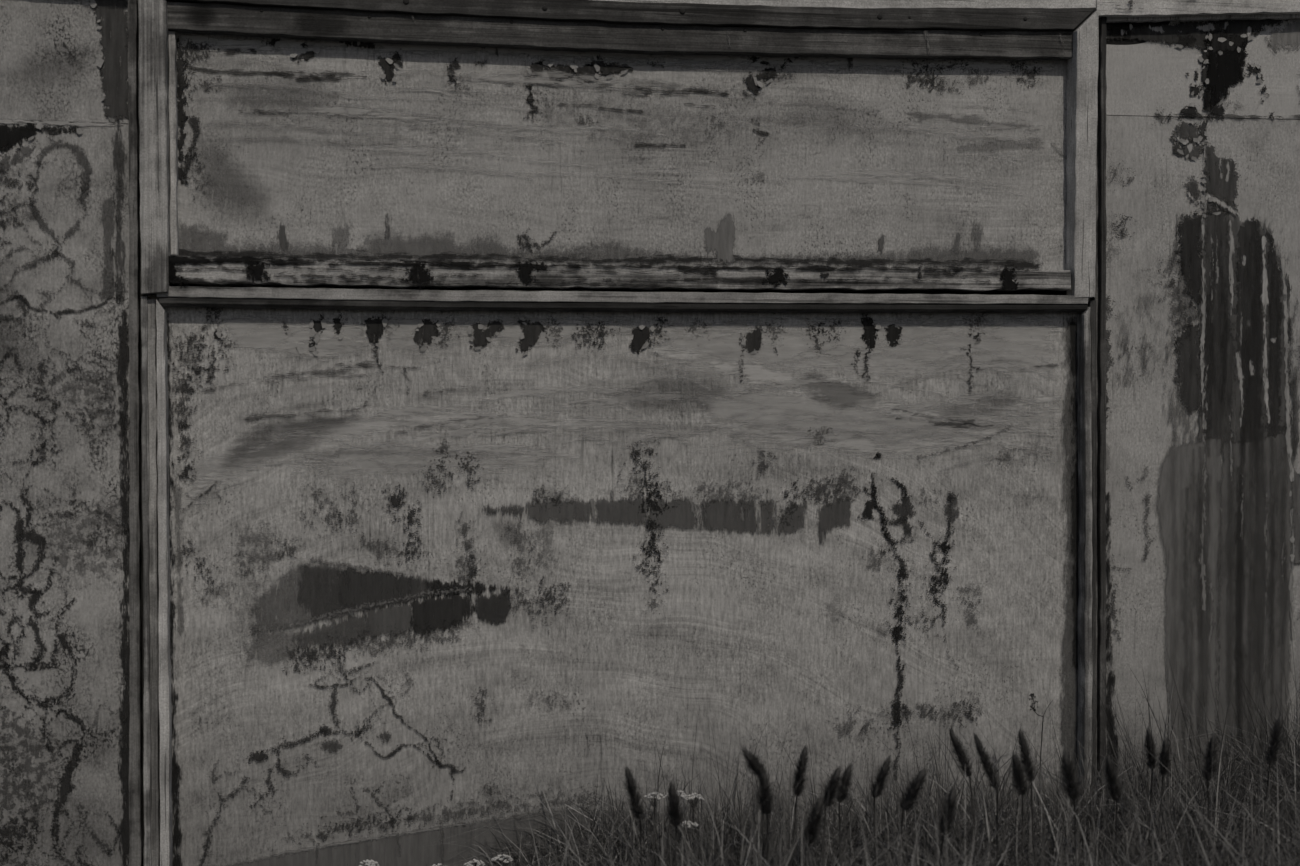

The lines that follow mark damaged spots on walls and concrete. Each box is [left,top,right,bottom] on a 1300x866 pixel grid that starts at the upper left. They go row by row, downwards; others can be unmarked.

peeling [437,55,665,101]
peeling [743,56,797,100]
peeling [0,120,83,153]
water stain [1203,146,1230,182]
peeling [1169,22,1269,218]
peeling [307,313,344,356]
peeling [364,310,673,374]
peeling [738,313,902,382]
crack [0,136,122,866]
water stain [1157,183,1300,800]
water stain [167,314,1079,866]
crack [199,651,465,866]